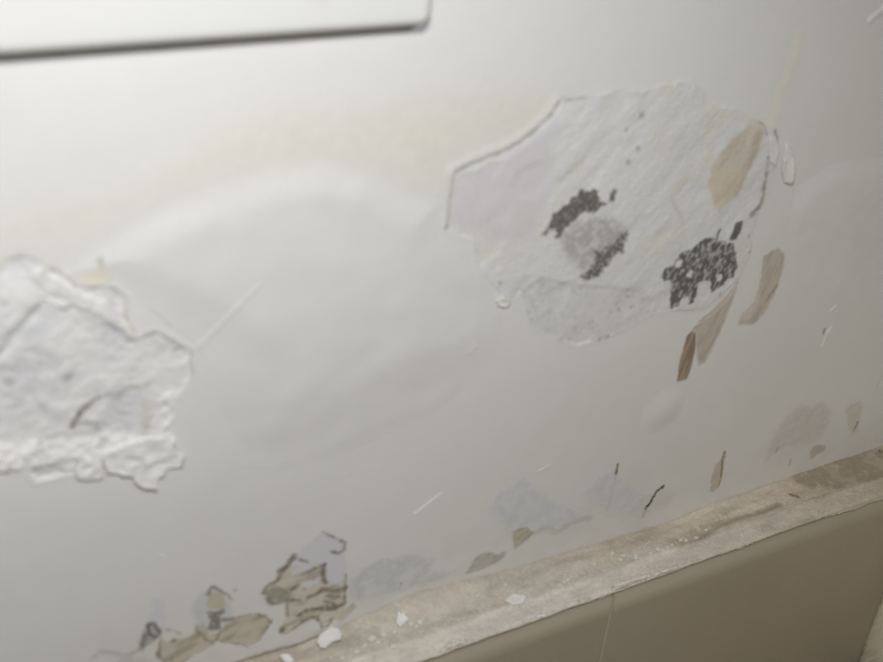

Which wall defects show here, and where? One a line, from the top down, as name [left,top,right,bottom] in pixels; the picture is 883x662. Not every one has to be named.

spalling [440,75,795,383]
spalling [0,252,198,492]
peeling [153,612,274,662]
peeling [317,627,343,648]